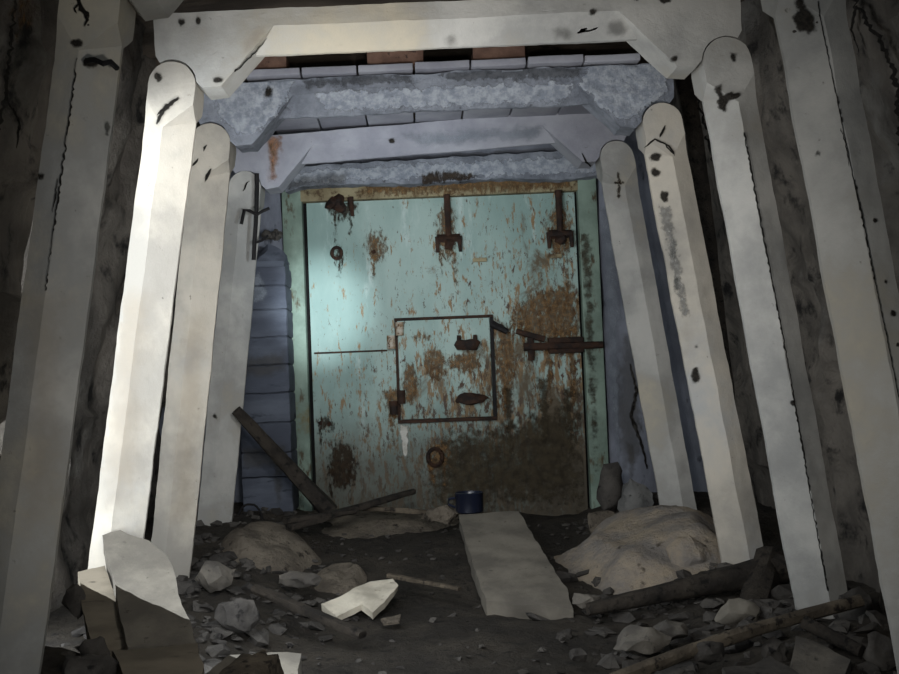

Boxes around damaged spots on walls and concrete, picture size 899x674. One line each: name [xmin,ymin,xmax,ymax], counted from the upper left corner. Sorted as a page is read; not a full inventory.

crack [74,0,90,26]
spalling [792,0,818,34]
crack [156,97,179,124]
spalling [714,85,740,111]
corrosion [269,137,281,177]
crack [644,126,675,156]
corrosion [329,181,575,284]
corrosion [426,204,595,511]
corrosion [383,332,481,437]
corrosion [316,416,359,496]